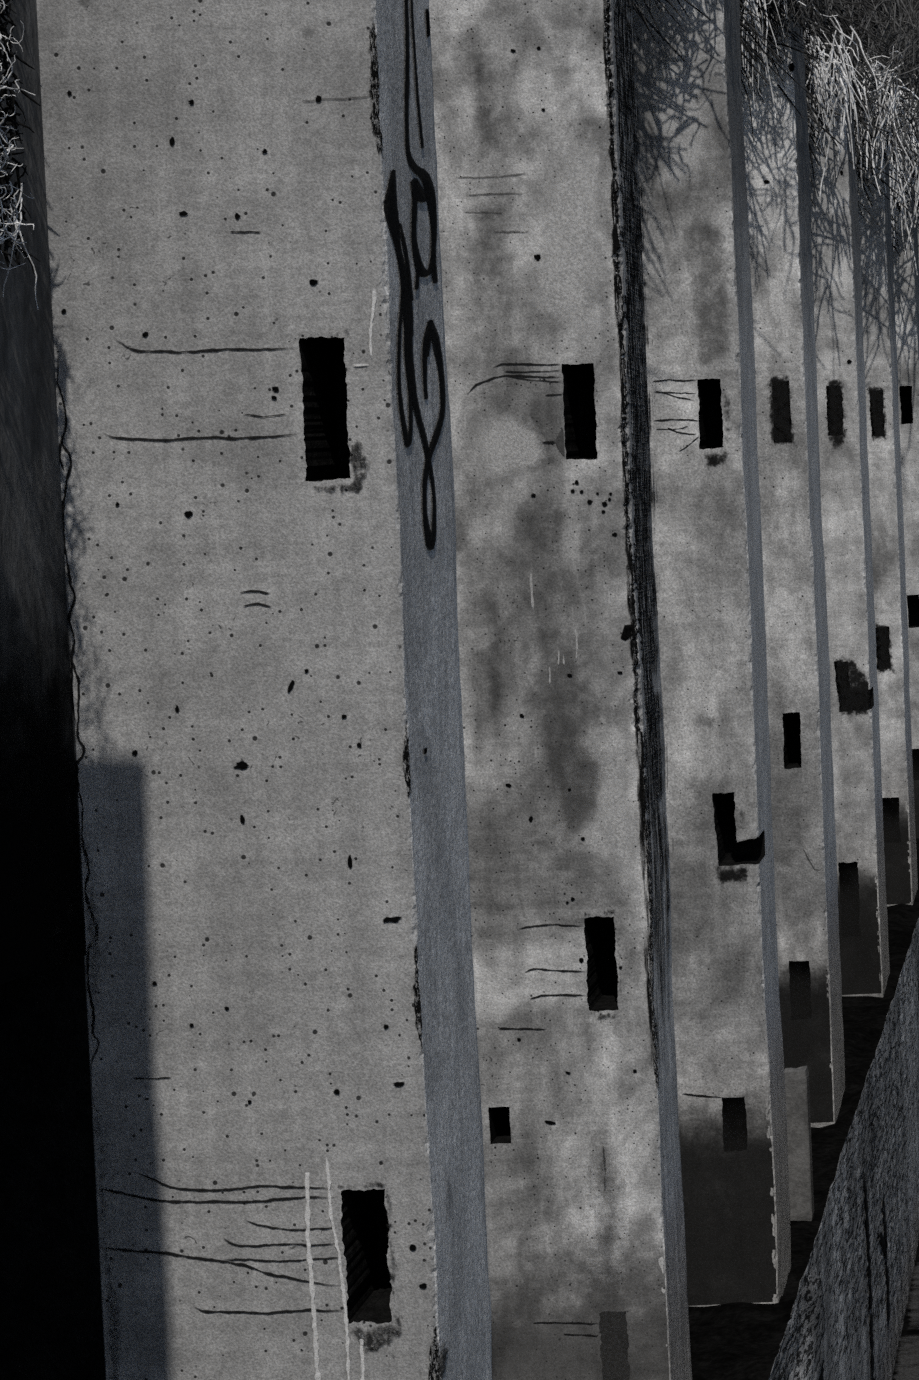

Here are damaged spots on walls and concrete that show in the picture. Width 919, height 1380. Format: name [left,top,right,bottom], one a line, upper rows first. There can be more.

crack [117,340,285,353]
crack [108,414,292,442]
crack [240,590,271,607]
crack [57,361,100,1097]
crack [101,1173,338,1315]